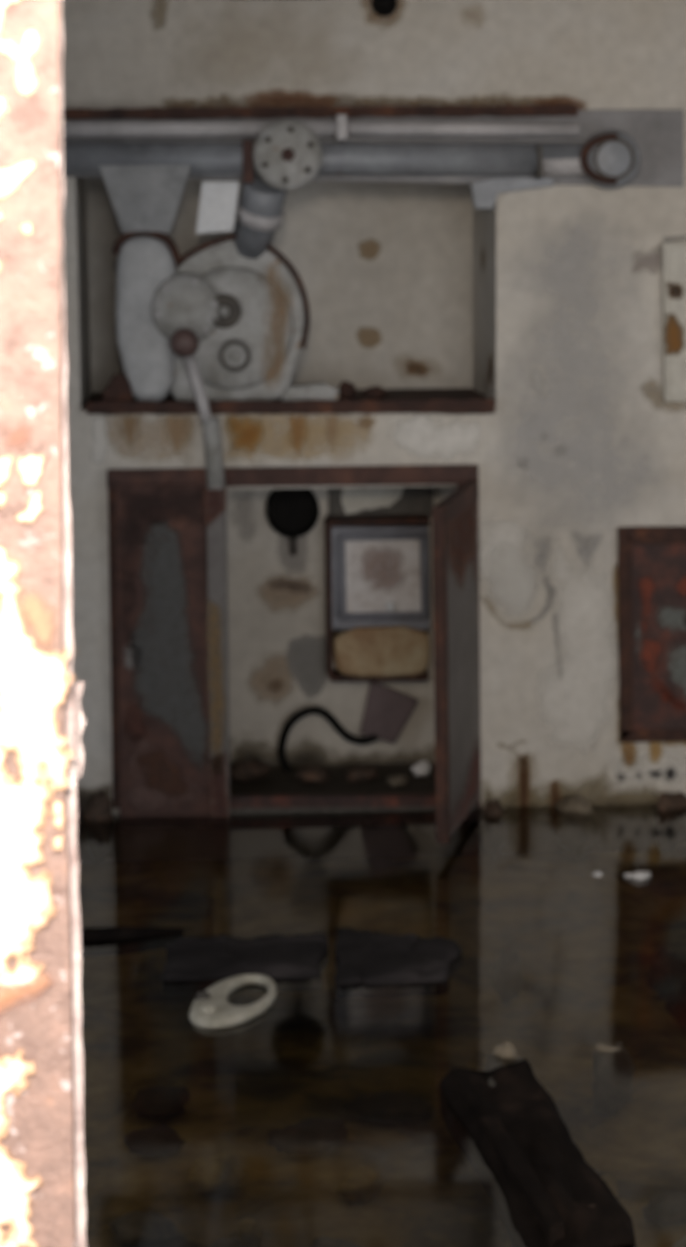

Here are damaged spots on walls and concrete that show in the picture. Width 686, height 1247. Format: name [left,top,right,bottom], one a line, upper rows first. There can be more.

peeling [0,0,41,119]
corrosion [165,90,584,110]
peeling [0,160,36,220]
corrosion [224,414,375,459]
peeling [0,454,44,523]
peeling [0,546,86,987]
peeling [0,1049,44,1247]